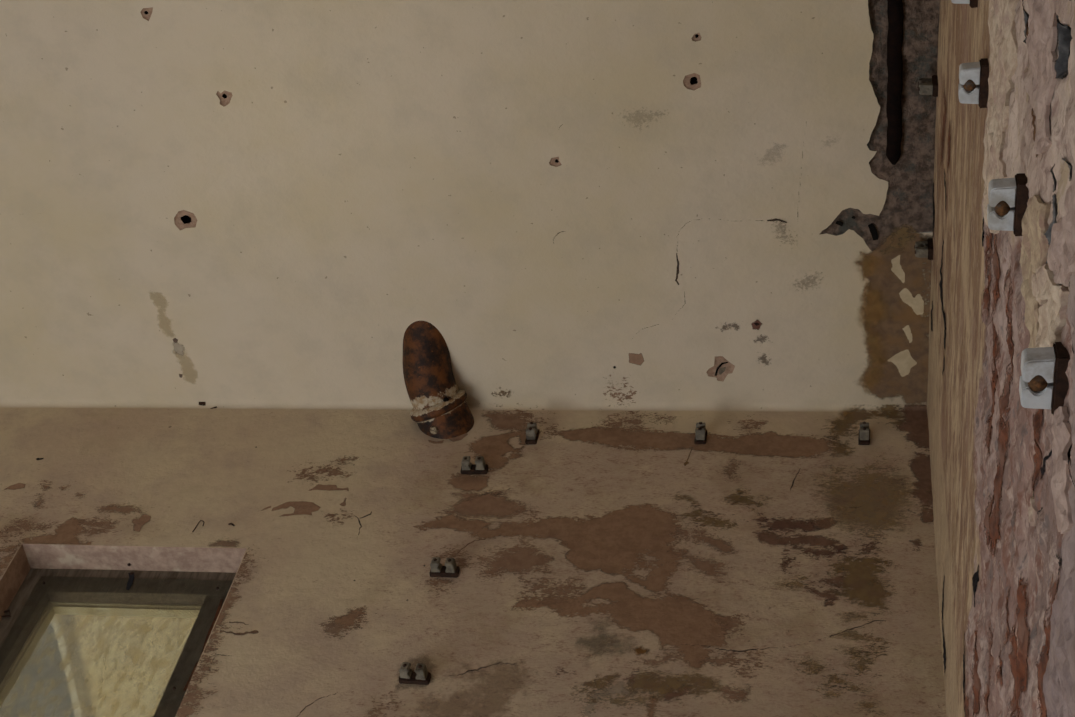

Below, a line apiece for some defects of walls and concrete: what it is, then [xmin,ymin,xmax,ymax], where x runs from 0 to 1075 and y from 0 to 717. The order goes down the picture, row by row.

spalling [820,0,940,251]
peeling [982,0,1072,234]
crack [636,221,690,334]
peeling [0,480,152,577]
peeling [263,457,358,525]
peeling [319,606,377,638]
peeling [414,375,832,703]
peeling [752,513,882,574]
peeling [805,572,845,606]
leakage [787,224,933,714]
peeling [893,405,934,523]